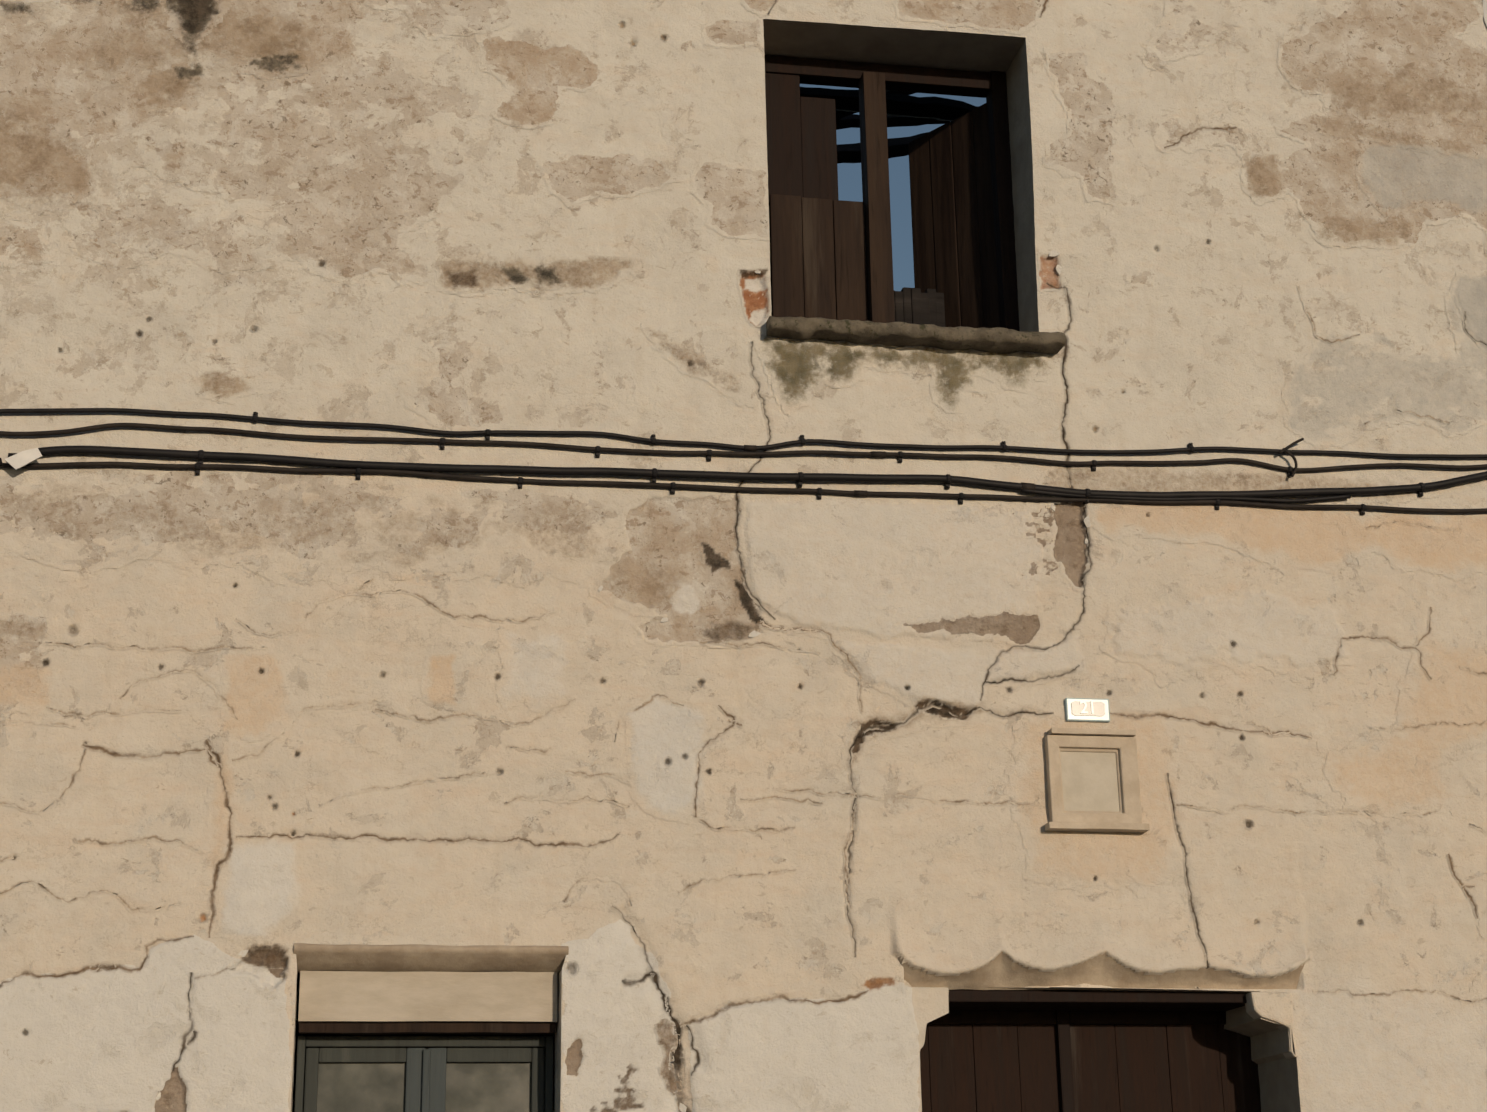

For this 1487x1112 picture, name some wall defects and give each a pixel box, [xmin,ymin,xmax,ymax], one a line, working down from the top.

peeling [0,31,607,286]
flaking render [735,263,772,328]
peeling [403,331,509,439]
damp [929,349,970,414]
damp [990,351,1039,393]
spalling [587,489,771,649]
spalling [898,496,1094,651]
crack [0,282,1094,1112]
crack [1333,607,1487,680]
crack [1370,719,1487,732]
crack [1166,773,1487,989]
spalling [151,1063,192,1112]